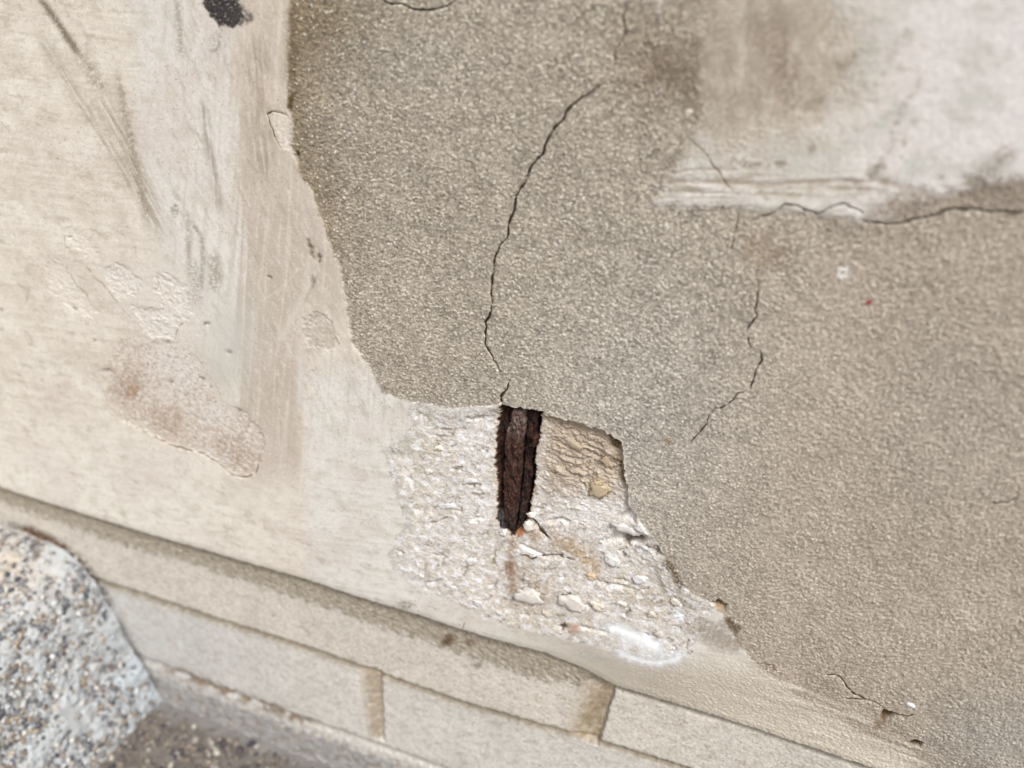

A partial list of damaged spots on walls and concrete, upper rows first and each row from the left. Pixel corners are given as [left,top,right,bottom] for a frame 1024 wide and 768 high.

crack [484,8,641,402]
crack [692,141,731,189]
crack [731,203,1023,249]
peeling [76,252,267,480]
crack [687,268,768,446]
corrosion [497,405,542,537]
spalling [382,402,715,660]